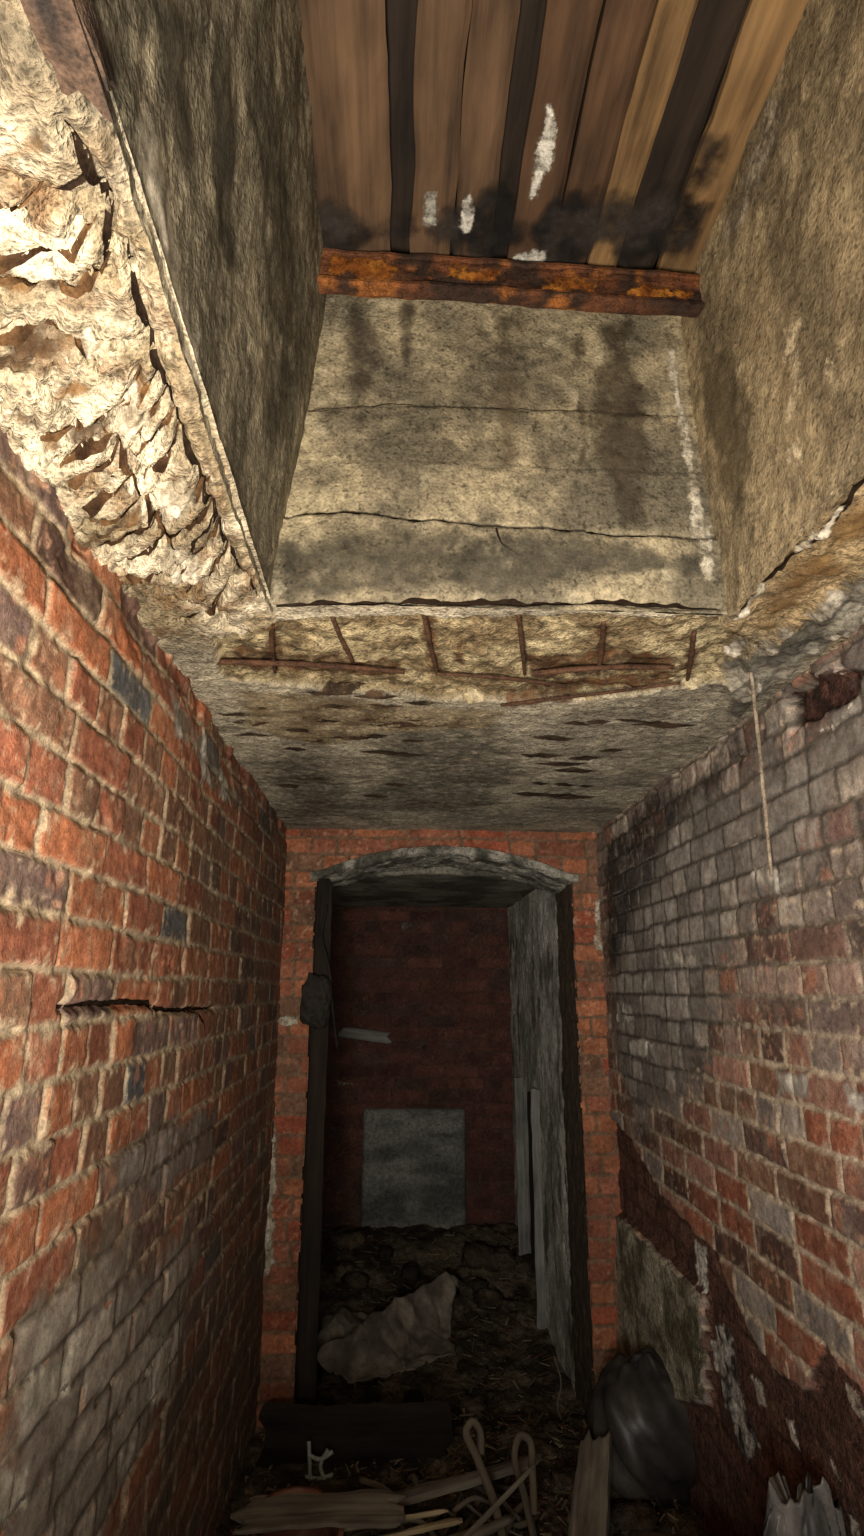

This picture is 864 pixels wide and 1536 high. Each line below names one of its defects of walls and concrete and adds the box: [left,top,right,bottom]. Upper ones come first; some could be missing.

damp [319,202,372,251]
damp [428,138,723,269]
corrosion [429,261,500,281]
corrosion [628,284,693,299]
spalling [0,0,864,800]
crack [52,120,864,621]
damp [667,348,716,581]
damp [285,532,660,600]
corrosion [235,626,397,675]
corrosion [507,627,696,707]
crack [56,999,212,1039]
spalling [618,1124,864,1536]